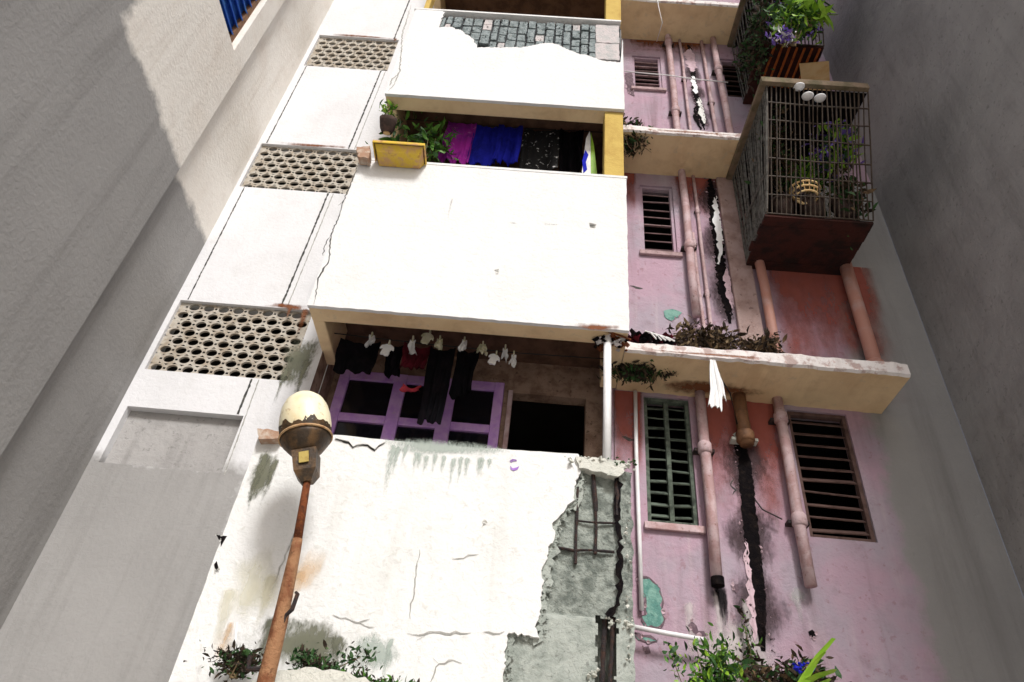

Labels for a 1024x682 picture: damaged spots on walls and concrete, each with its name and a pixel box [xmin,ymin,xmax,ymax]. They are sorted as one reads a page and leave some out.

flaking render [441,16,635,96]
crack [314,162,359,301]
leakage [250,453,279,500]
leakage [388,441,498,471]
crack [407,549,504,682]
spalling [503,455,666,682]